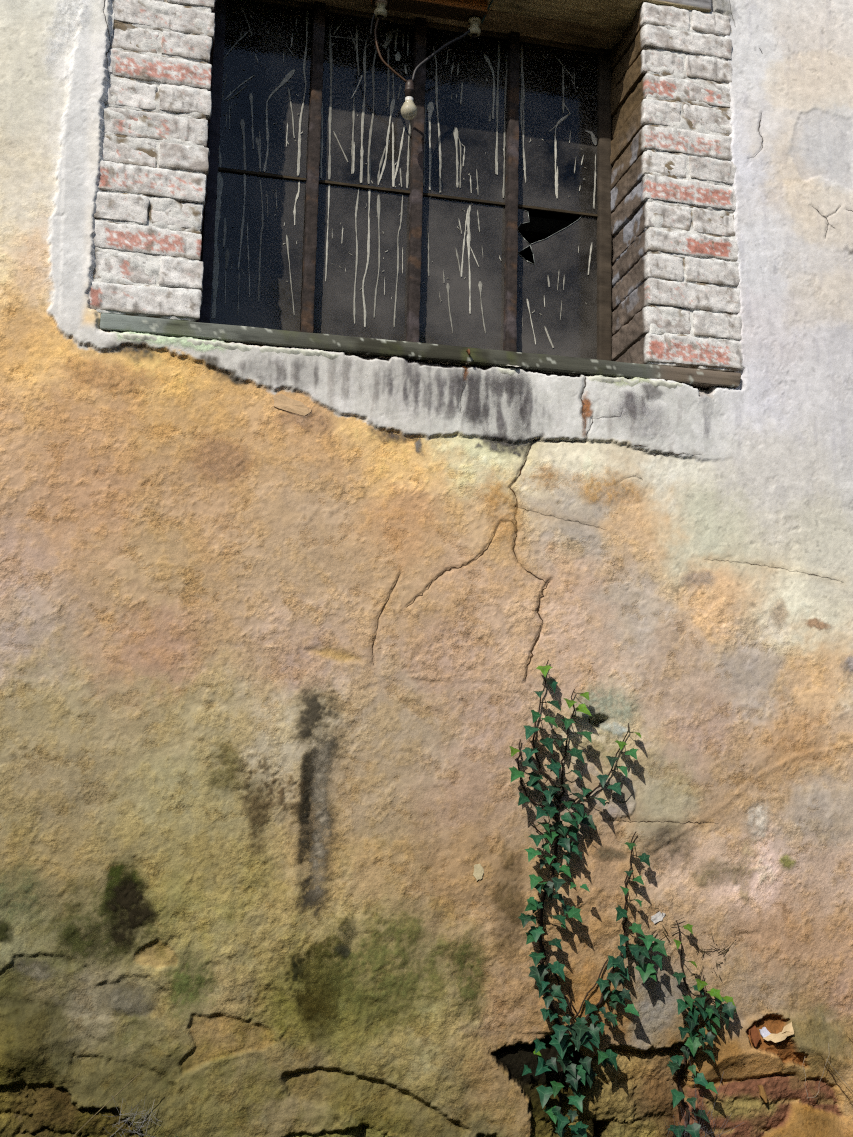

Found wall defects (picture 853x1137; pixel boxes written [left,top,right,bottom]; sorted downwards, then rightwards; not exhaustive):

water stain [110,342,152,356]
water stain [206,357,241,384]
water stain [383,361,532,456]
water stain [616,377,660,417]
crack [372,377,622,679]
water stain [219,690,338,917]
flaking render [651,912,665,924]
flaking render [0,938,181,1023]
flaking render [177,1012,279,1077]
flaking render [281,1065,472,1137]
flaking render [676,1014,842,1137]